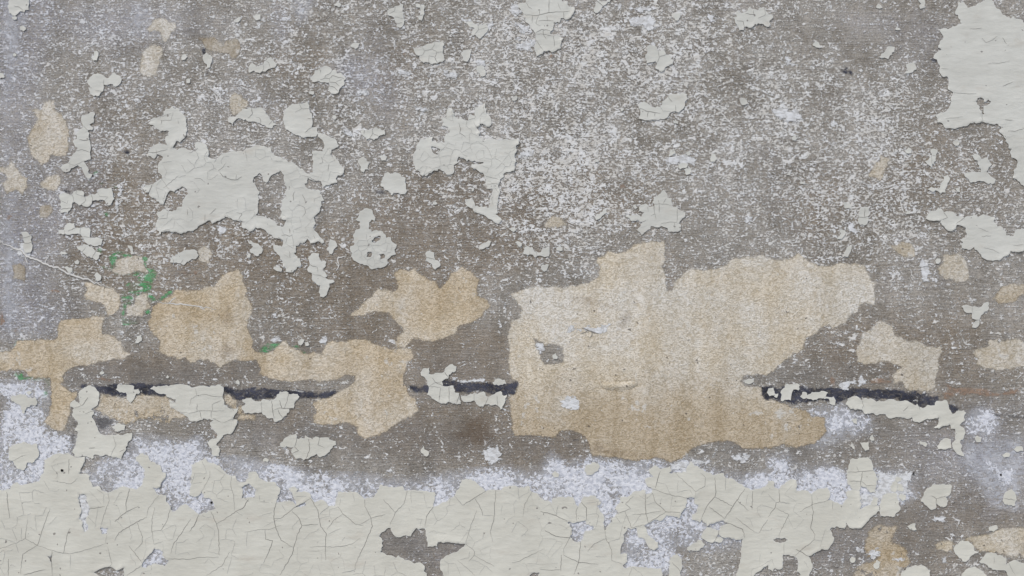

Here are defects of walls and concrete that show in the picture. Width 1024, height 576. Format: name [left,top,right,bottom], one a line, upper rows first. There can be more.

peeling [933,0,1024,186]
peeling [142,66,346,297]
water stain [0,379,75,490]
peeling [0,190,981,576]
water stain [88,434,921,542]
water stain [621,497,742,574]
water stain [762,386,1021,506]
peeling [954,540,1024,576]
peeling [1003,489,1017,506]